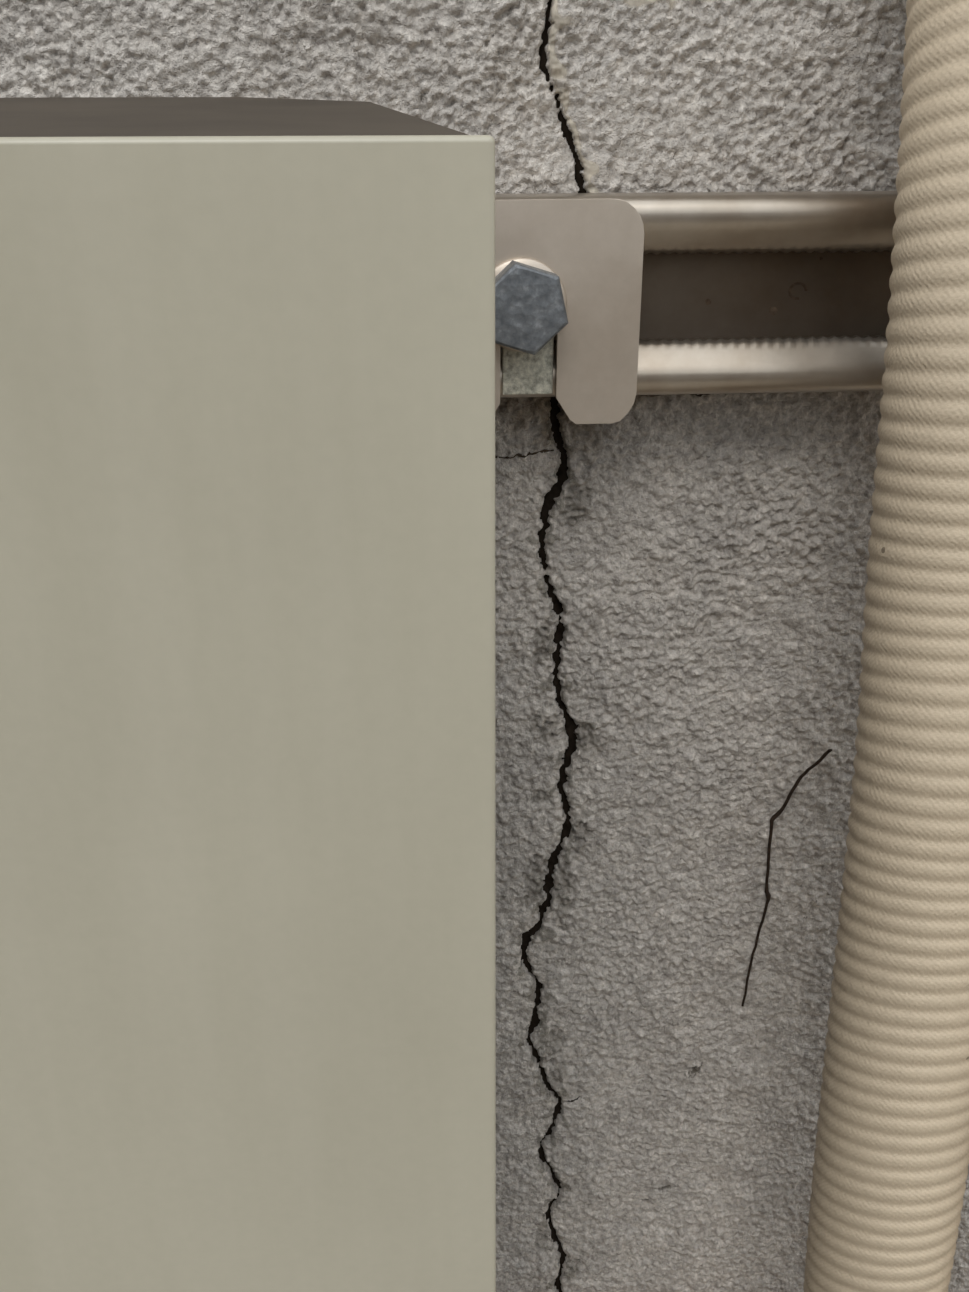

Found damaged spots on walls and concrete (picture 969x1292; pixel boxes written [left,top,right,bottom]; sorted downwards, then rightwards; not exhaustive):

crack [539,0,599,193]
crack [639,391,709,399]
crack [495,397,580,1292]